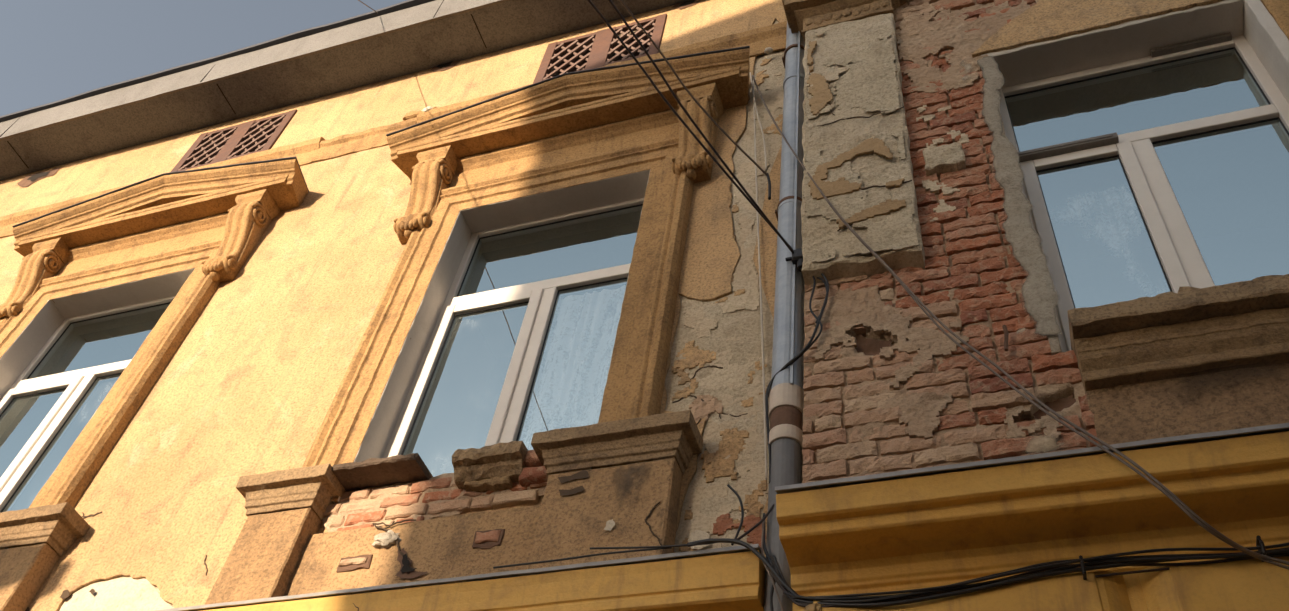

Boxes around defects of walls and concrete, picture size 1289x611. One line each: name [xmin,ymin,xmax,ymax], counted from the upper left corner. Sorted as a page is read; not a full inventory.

flaking render [671,0,700,9]
flaking render [802,0,1099,483]
peeling [665,49,785,555]
flaking render [322,473,547,532]
flaking render [472,529,505,549]
flaking render [336,554,373,573]
flaking render [395,548,428,579]
flaking render [59,577,173,611]